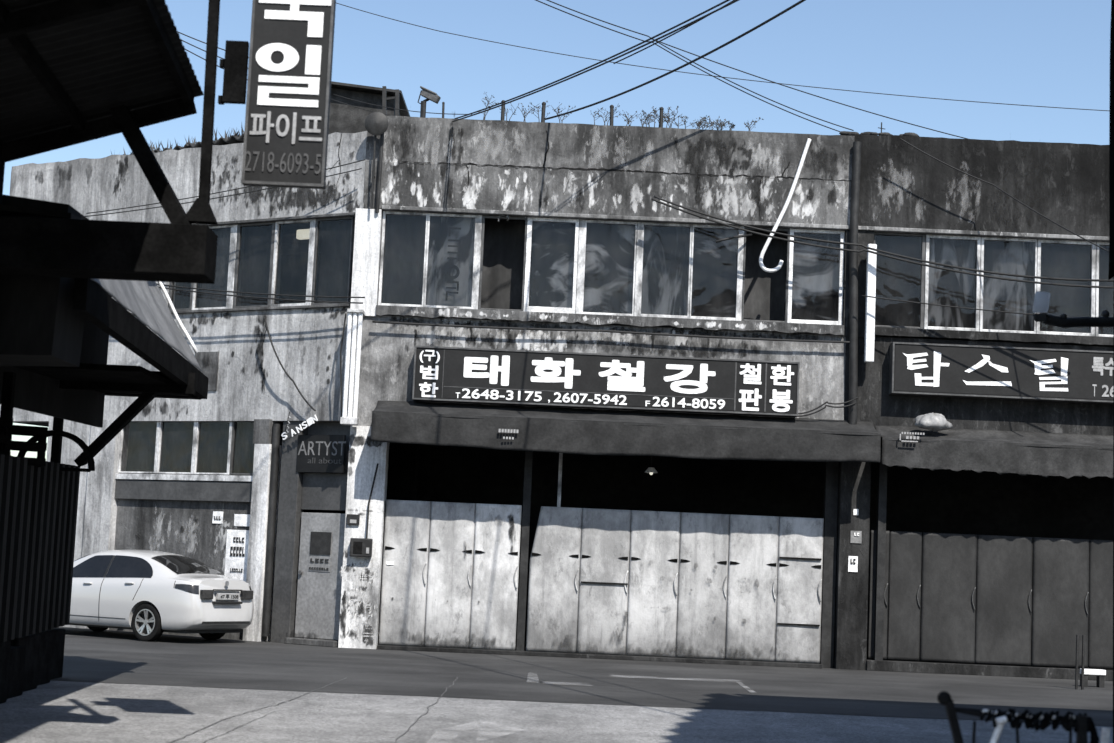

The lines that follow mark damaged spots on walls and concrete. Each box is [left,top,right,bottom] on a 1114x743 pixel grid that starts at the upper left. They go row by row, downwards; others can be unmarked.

damp [114,155,128,192]
damp [393,126,416,174]
damp [441,113,463,198]
peeling [462,177,482,209]
peeling [498,170,533,216]
peeling [548,174,595,209]
peeling [613,185,683,215]
damp [675,138,761,216]
damp [255,315,266,392]